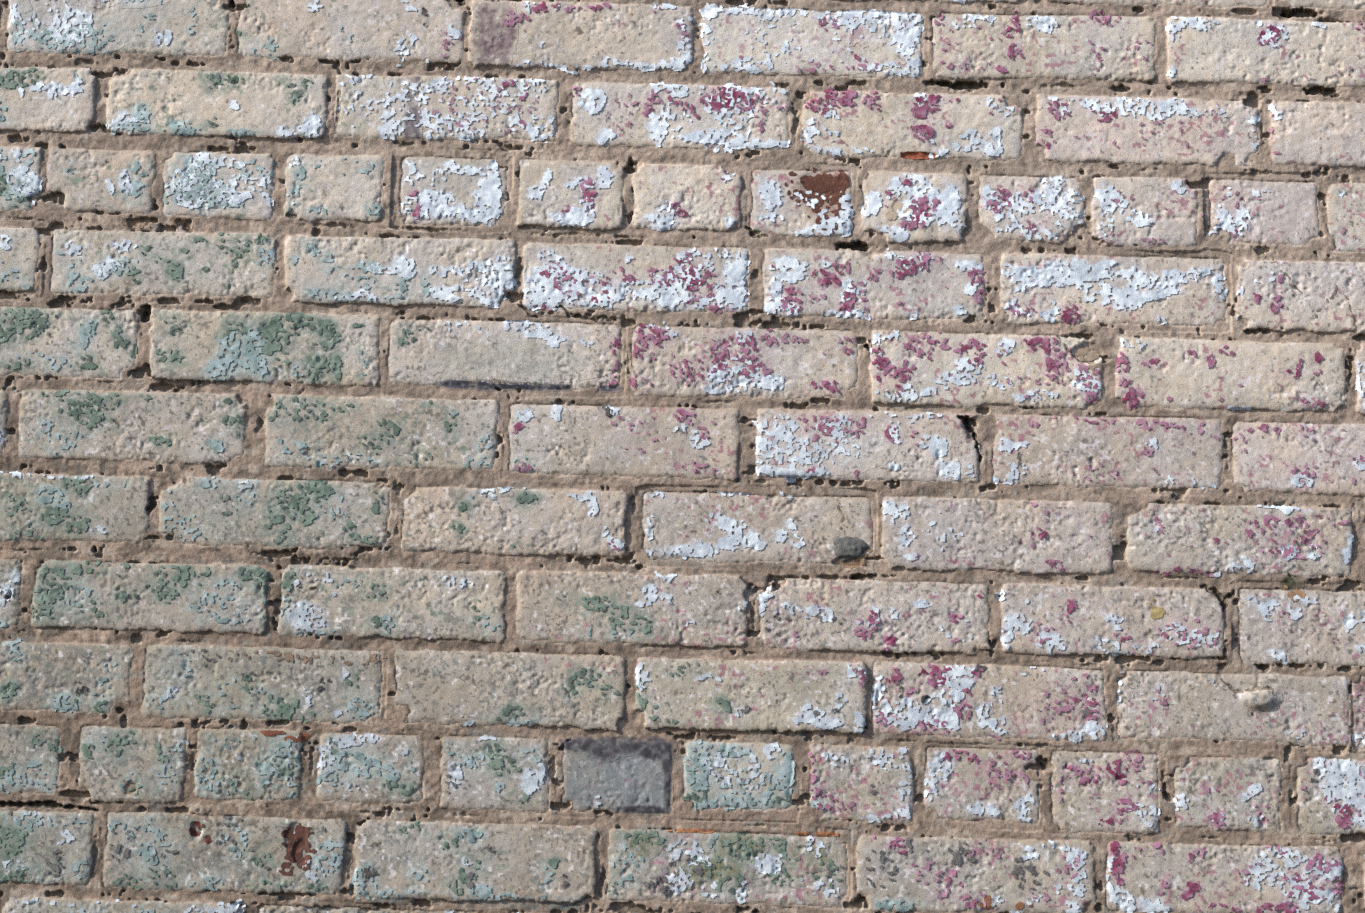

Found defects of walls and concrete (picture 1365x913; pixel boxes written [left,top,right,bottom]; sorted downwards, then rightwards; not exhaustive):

peeling [56,151,326,292]
peeling [267,0,1283,498]
peeling [205,312,364,383]
peeling [882,500,963,561]
peeling [581,513,805,637]
peeling [738,586,833,638]
peeling [977,590,1078,675]
peeling [1093,613,1220,706]
peeling [1037,673,1108,743]
peeling [682,662,1087,913]
peeling [1300,757,1365,829]
peeling [1106,841,1344,913]